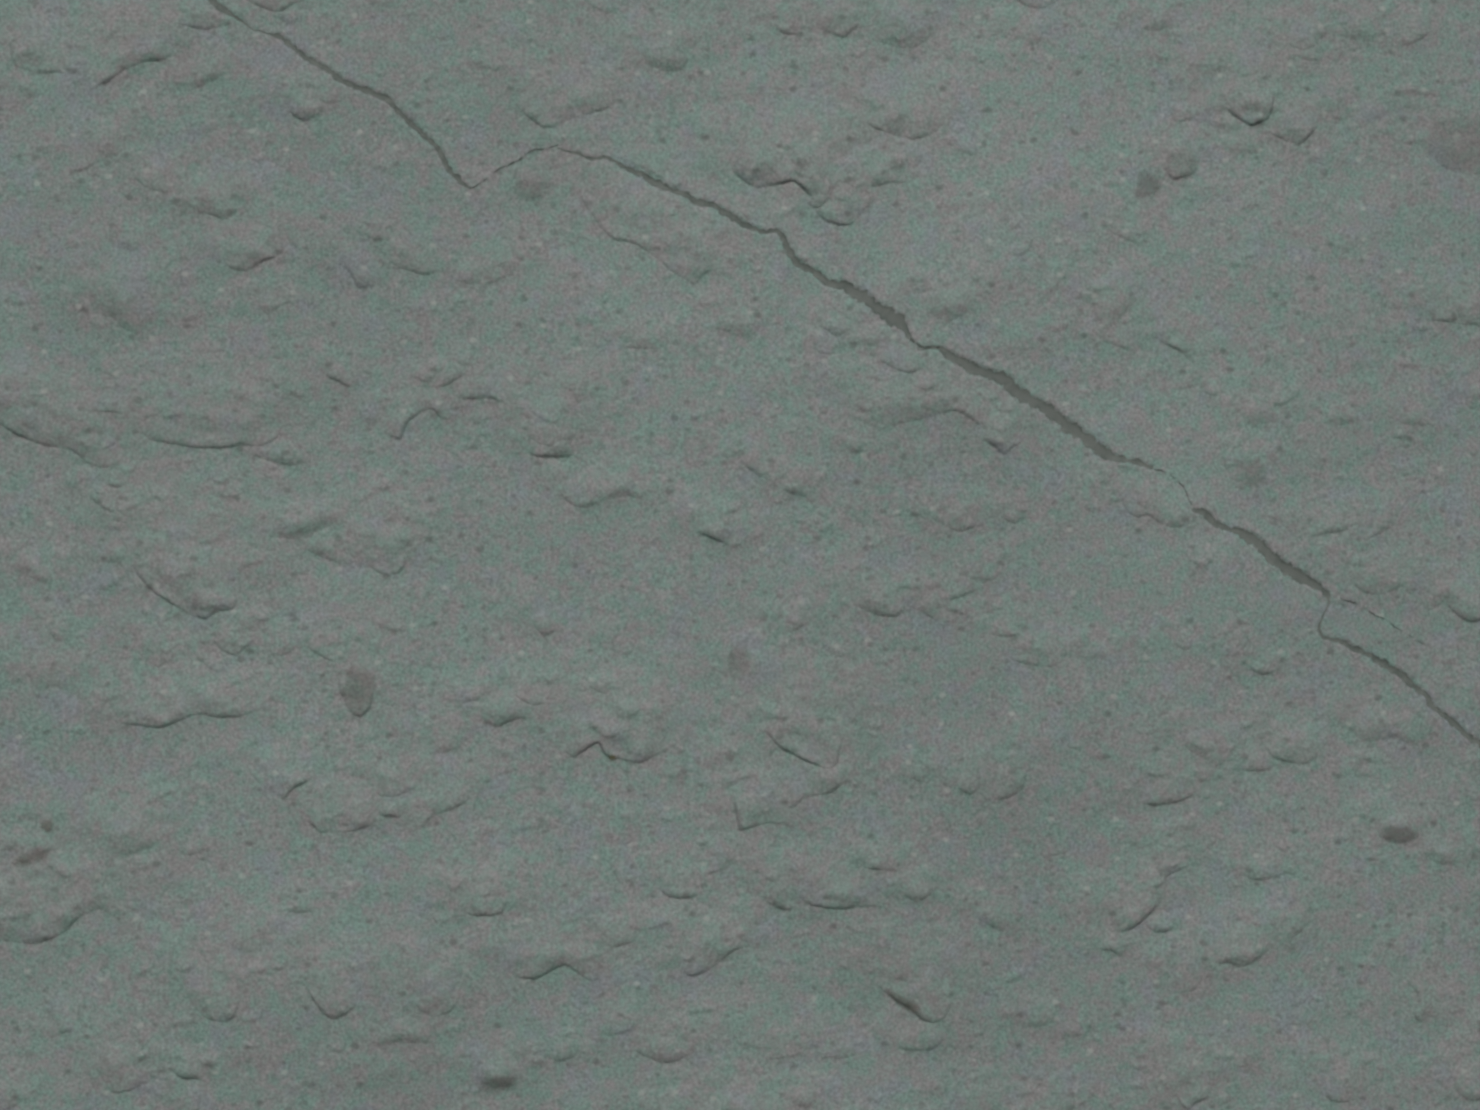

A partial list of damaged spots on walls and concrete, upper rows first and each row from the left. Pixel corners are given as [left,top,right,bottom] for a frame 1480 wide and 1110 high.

crack [208,0,1480,748]